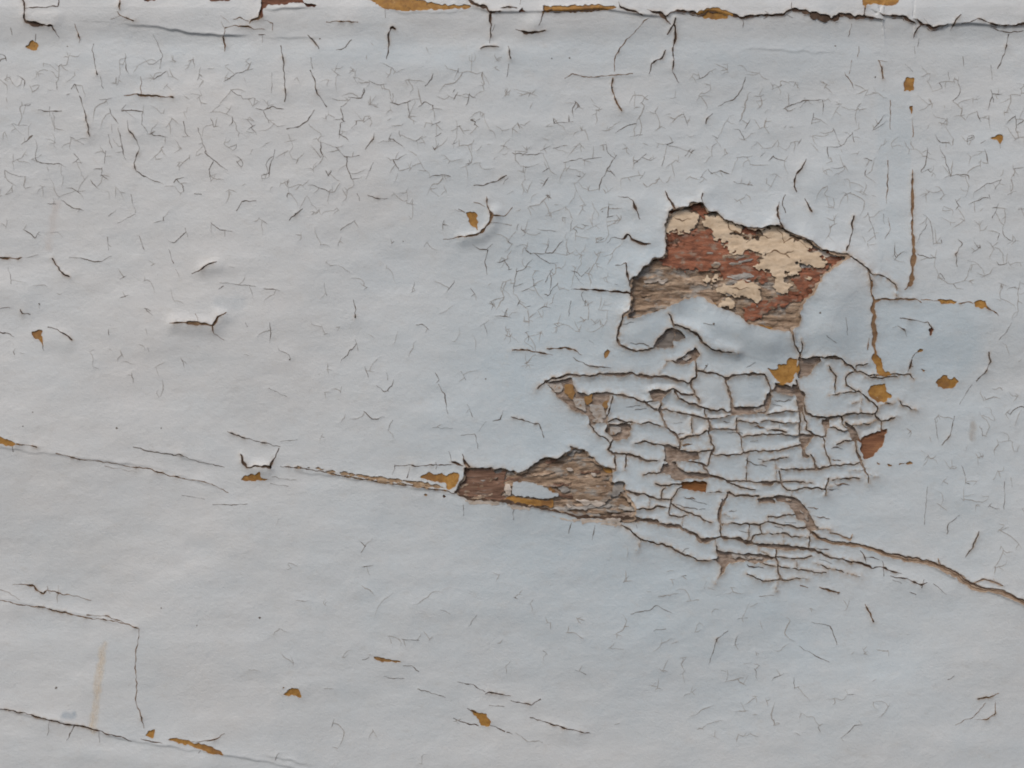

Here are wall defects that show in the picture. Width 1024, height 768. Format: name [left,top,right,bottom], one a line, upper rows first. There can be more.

peeling [259,0,316,18]
peeling [371,0,473,11]
peeling [542,4,616,13]
peeling [696,7,733,20]
peeling [862,0,899,8]
crack [0,0,1024,605]
peeling [296,202,925,582]
crack [361,541,589,743]
crack [0,584,160,743]